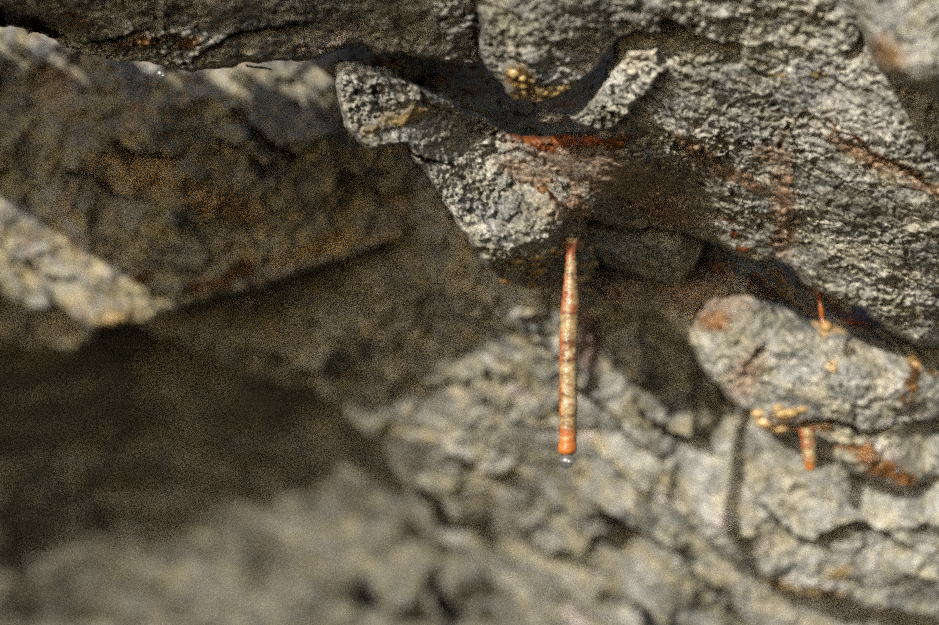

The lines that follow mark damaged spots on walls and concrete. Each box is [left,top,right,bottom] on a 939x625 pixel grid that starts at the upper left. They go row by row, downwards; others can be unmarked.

rust [510,131,635,153]
rust [720,215,749,252]
rust [814,289,879,330]
rust [769,409,833,442]